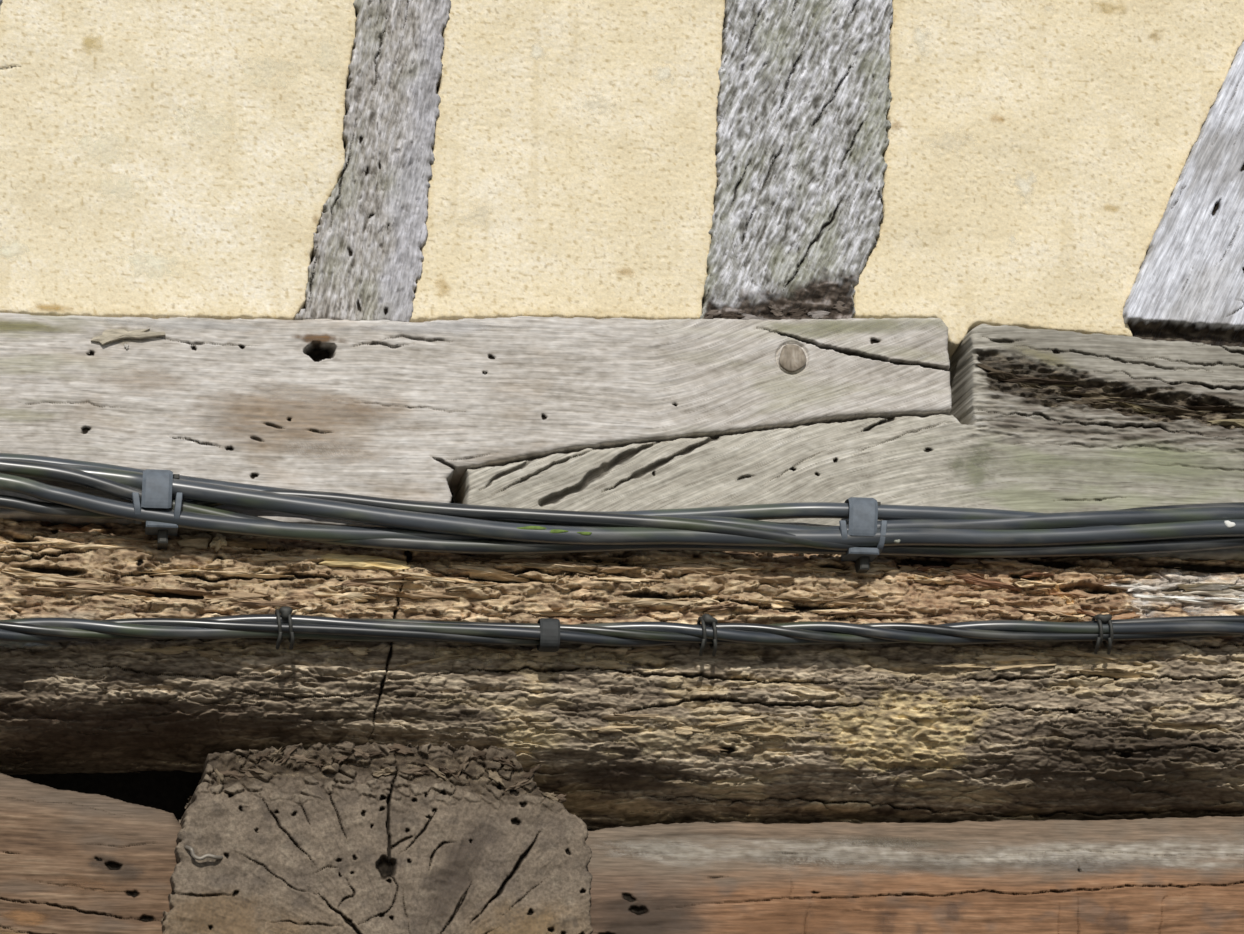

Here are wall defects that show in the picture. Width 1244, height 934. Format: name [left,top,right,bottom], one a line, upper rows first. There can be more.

crack [763,329,947,371]
crack [1061,344,1244,390]
crack [861,419,895,450]
crack [432,445,701,503]
crack [27,549,1244,734]
crack [254,780,454,934]
crack [440,834,538,934]